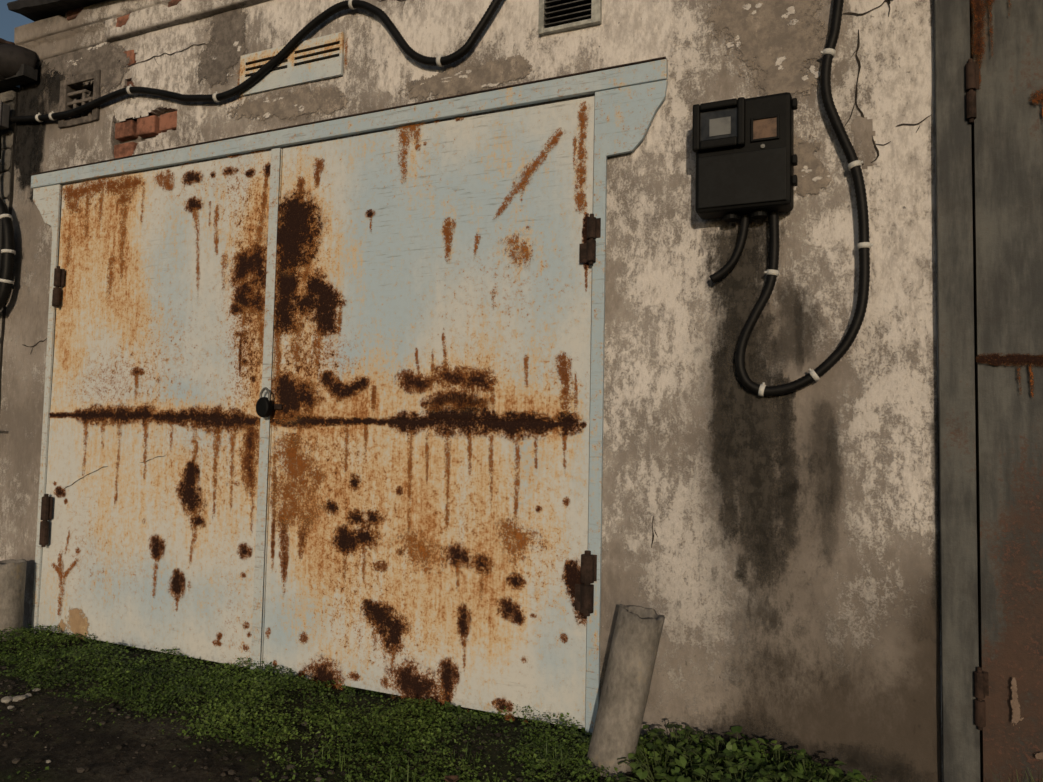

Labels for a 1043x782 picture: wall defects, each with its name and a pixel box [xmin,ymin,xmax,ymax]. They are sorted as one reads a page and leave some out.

peeling [706,0,831,98]
crack [843,0,931,165]
corrosion [970,0,995,86]
flaking render [114,110,177,158]
corrosion [396,120,439,182]
corrosion [495,101,589,243]
corrosion [49,150,587,626]
damp [699,219,799,586]
corrosion [976,353,1043,397]
corrosion [298,656,360,690]
corrosion [360,599,472,707]
corrosion [491,698,527,723]